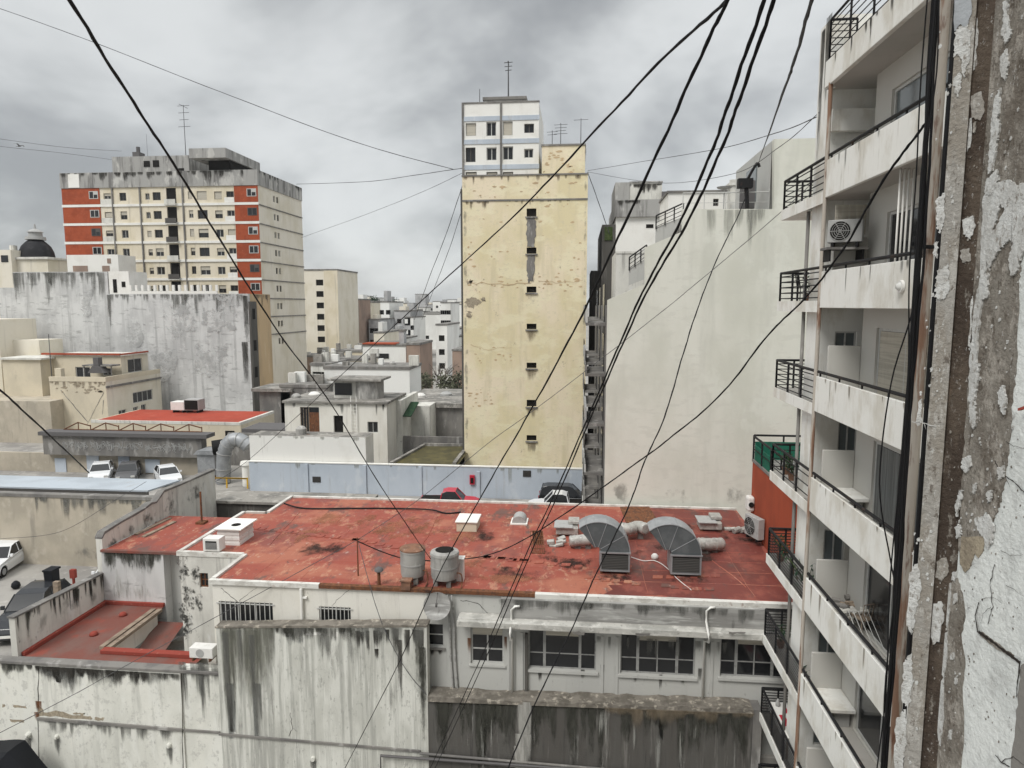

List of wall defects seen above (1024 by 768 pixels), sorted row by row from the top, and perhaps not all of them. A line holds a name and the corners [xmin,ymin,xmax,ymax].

leakage [61,170,243,180]
leakage [12,272,268,378]
flaking render [894,0,1024,768]
mould [177,563,202,635]
crack [975,550,1021,698]
leakage [2,628,516,766]
leakage [530,706,604,760]
leakage [621,709,749,755]